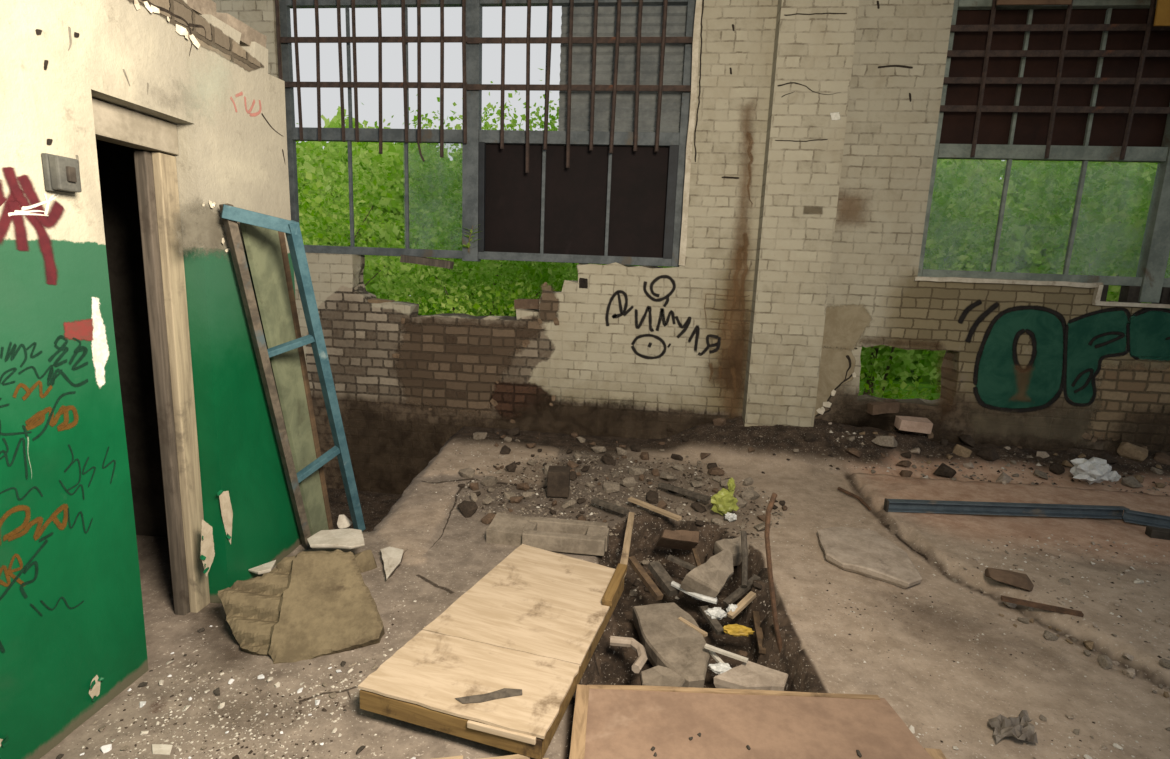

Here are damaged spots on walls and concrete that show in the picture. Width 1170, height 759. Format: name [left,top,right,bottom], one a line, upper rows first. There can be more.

spalling [128,0,264,72]
rust [721,110,753,365]
spalling [392,282,559,423]
peeling [815,347,857,416]
peeling [200,490,233,576]